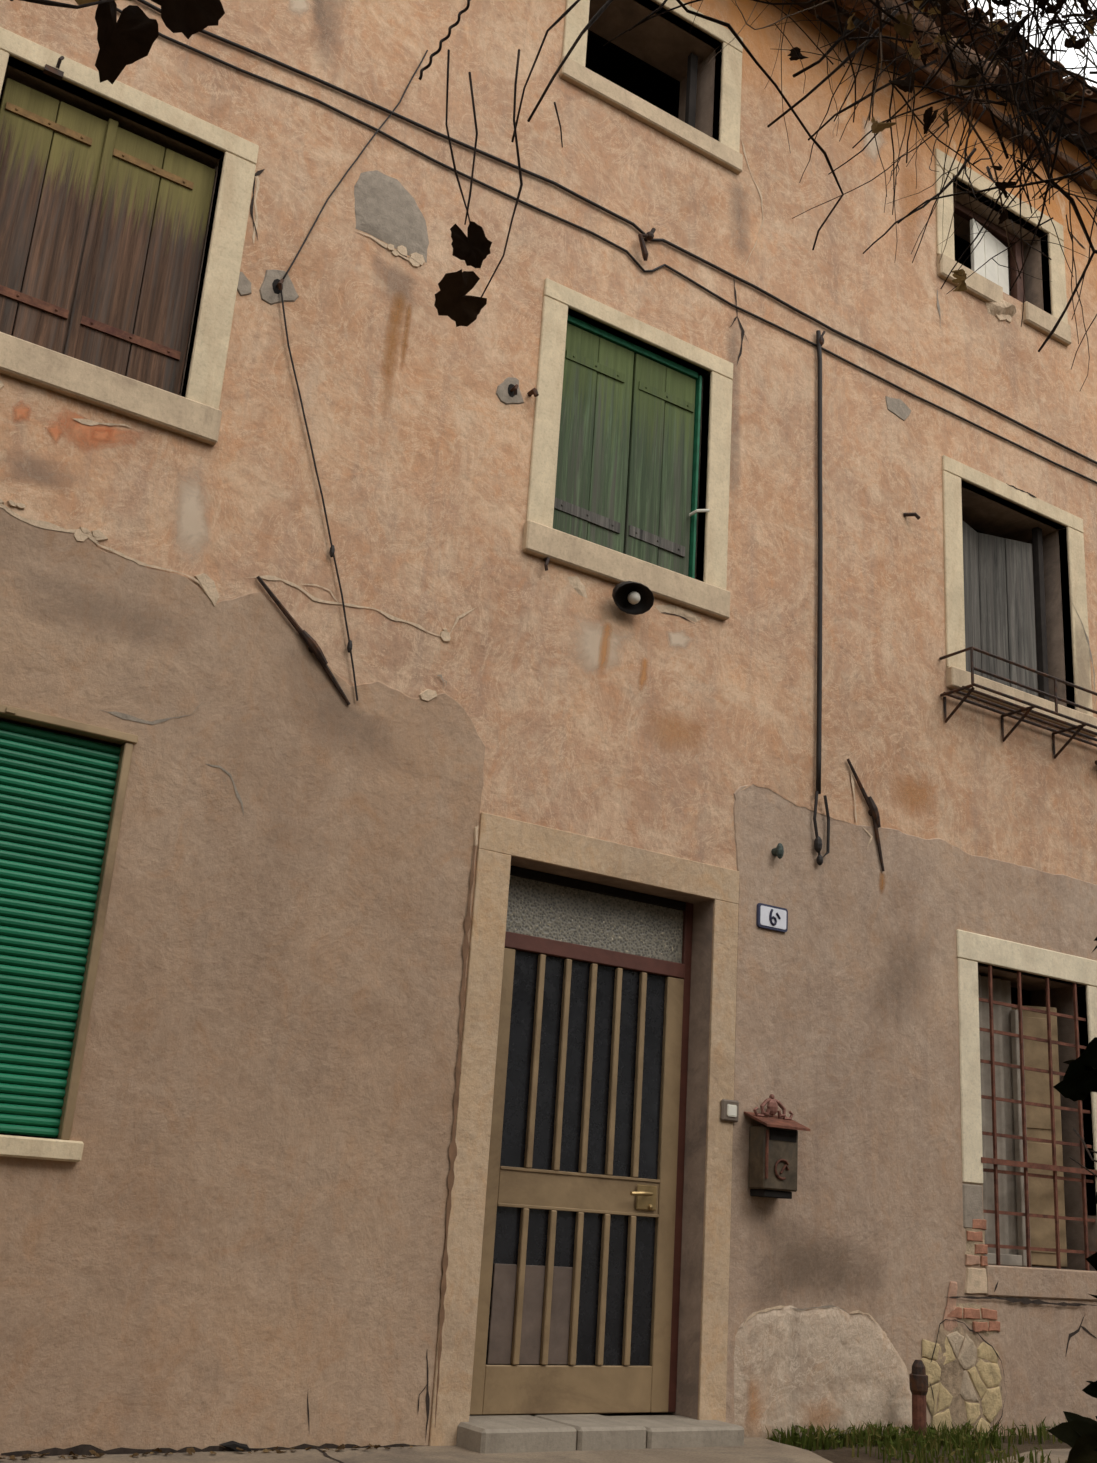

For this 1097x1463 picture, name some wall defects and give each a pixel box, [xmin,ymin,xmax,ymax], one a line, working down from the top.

peeling [386,244,425,268]
flaking render [48,412,132,447]
peeling [0,499,219,606]
peeling [246,575,475,642]
spalling [419,675,447,702]
spalling [965,1219,988,1266]